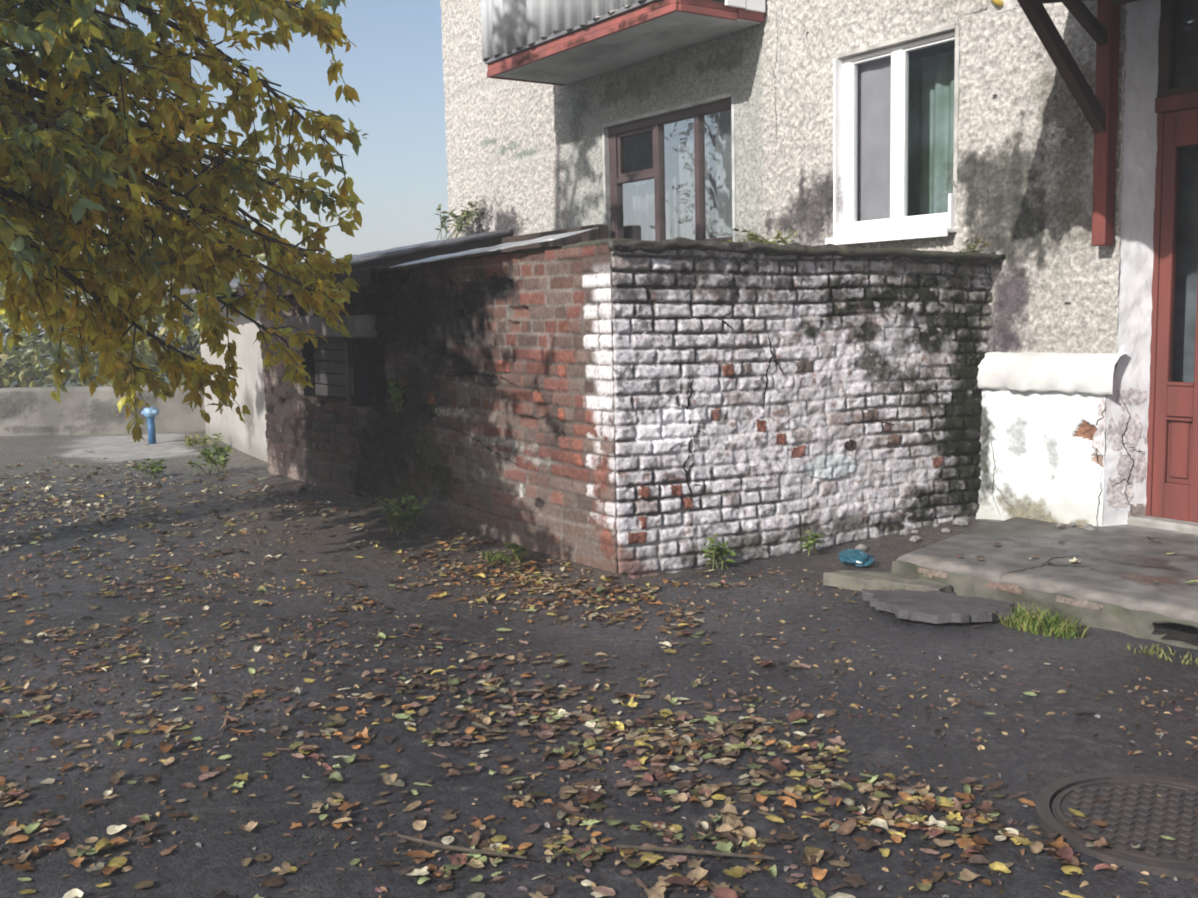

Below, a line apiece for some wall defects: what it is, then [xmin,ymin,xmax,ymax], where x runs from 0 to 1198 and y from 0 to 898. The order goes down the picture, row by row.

leakage [714,74,1176,569]
peeling [722,362,752,376]
spalling [793,360,814,373]
peeling [574,453,611,492]
crack [683,369,705,502]
peeling [756,419,806,458]
peeling [1072,388,1147,518]
crack [1083,390,1145,526]
peeling [670,483,693,509]
peeling [598,514,647,553]
crack [1001,556,1087,577]
spalling [1152,622,1198,646]